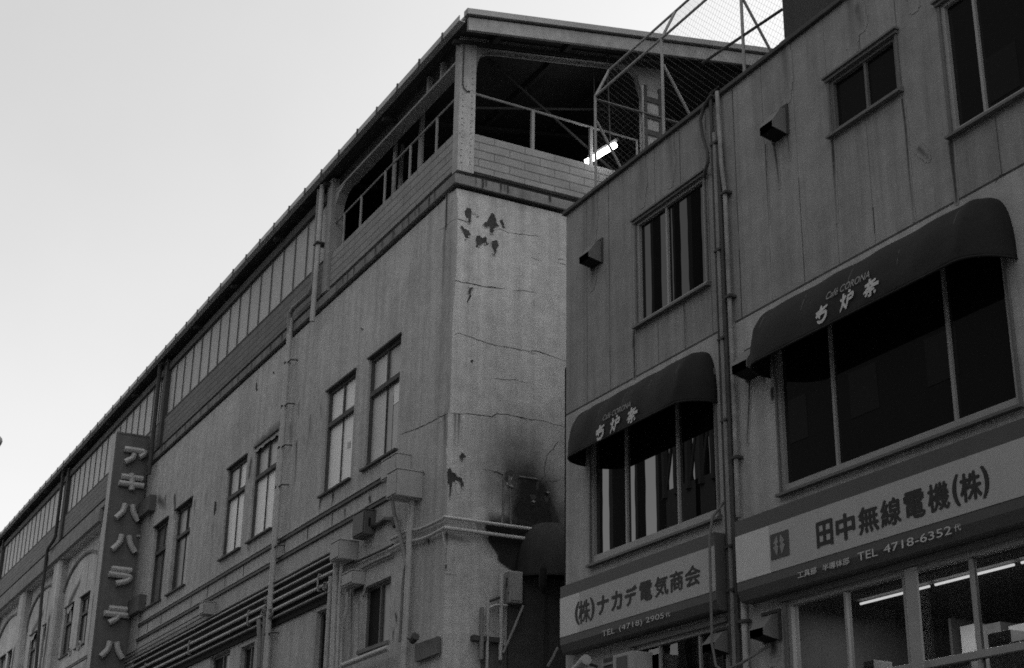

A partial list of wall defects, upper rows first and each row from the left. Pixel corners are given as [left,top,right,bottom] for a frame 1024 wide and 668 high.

spalling [460,207,506,256]
crack [455,280,536,293]
crack [457,333,561,360]
crack [405,413,561,483]
spalling [446,451,467,499]